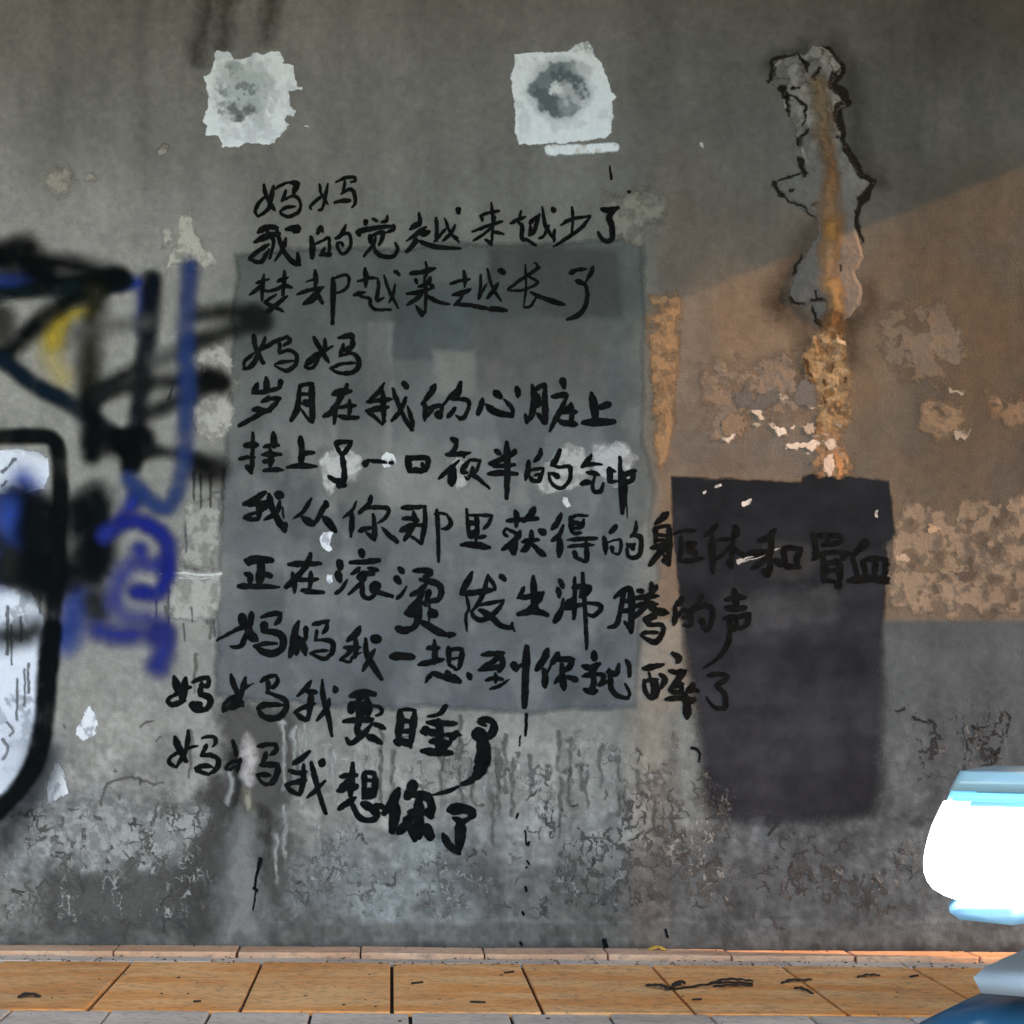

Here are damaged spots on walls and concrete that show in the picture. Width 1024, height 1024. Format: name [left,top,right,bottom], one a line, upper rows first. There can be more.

corrosion [808,78,846,340]
peeling [646,291,683,470]
peeling [696,328,855,479]
peeling [876,301,971,443]
peeling [887,495,1024,621]
crack [99,769,203,827]